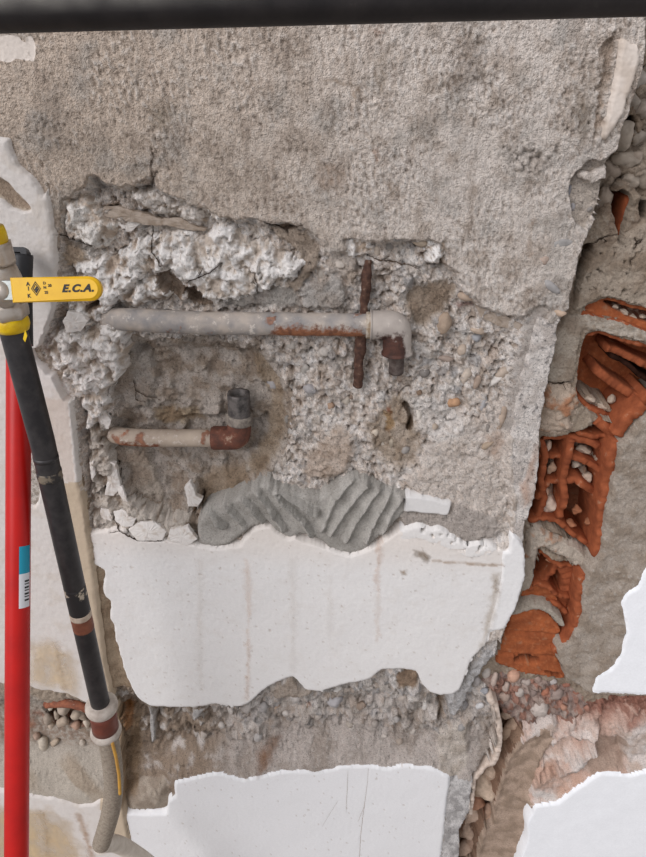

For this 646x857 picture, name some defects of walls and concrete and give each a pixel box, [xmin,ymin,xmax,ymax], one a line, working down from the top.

hole [492,137,566,183]
spalling [568,155,610,227]
spalling [611,191,629,235]
corrosion [360,260,372,314]
spalling [35,174,533,557]
corrosion [353,336,366,389]
spalling [96,566,503,815]
spalling [29,686,104,804]
spalling [520,694,646,807]